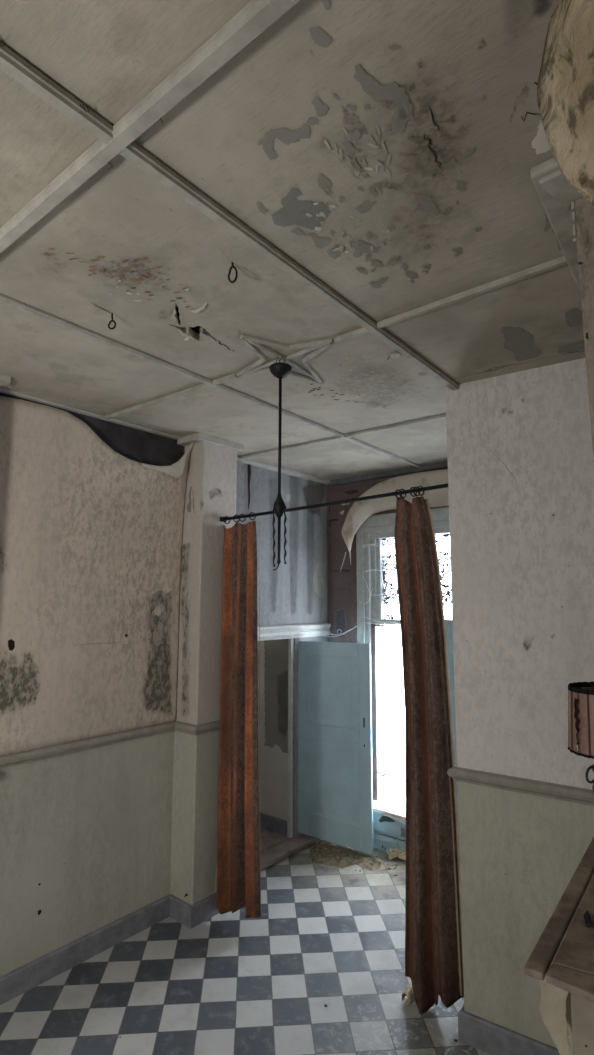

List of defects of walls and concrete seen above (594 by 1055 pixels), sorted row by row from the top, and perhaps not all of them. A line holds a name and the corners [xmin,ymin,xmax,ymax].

peeling [256,64,453,288]
mould [0,653,37,712]
mould [143,543,189,713]